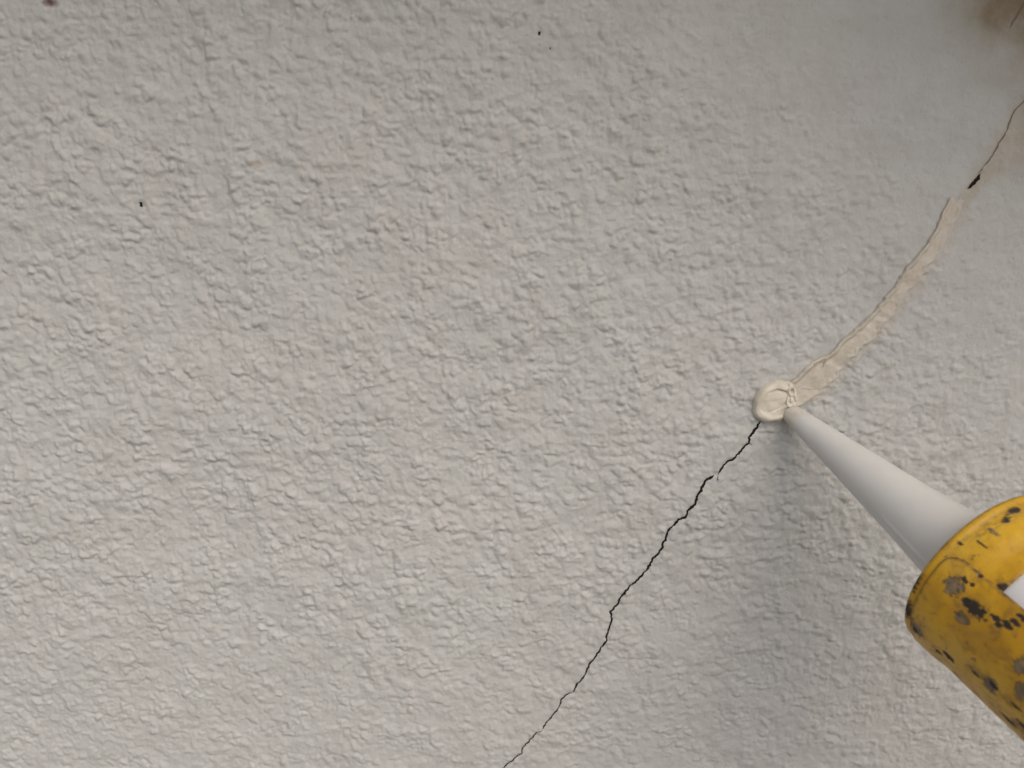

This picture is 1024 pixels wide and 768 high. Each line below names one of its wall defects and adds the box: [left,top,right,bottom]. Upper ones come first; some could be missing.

crack [968,101,1024,189]
crack [503,421,761,768]